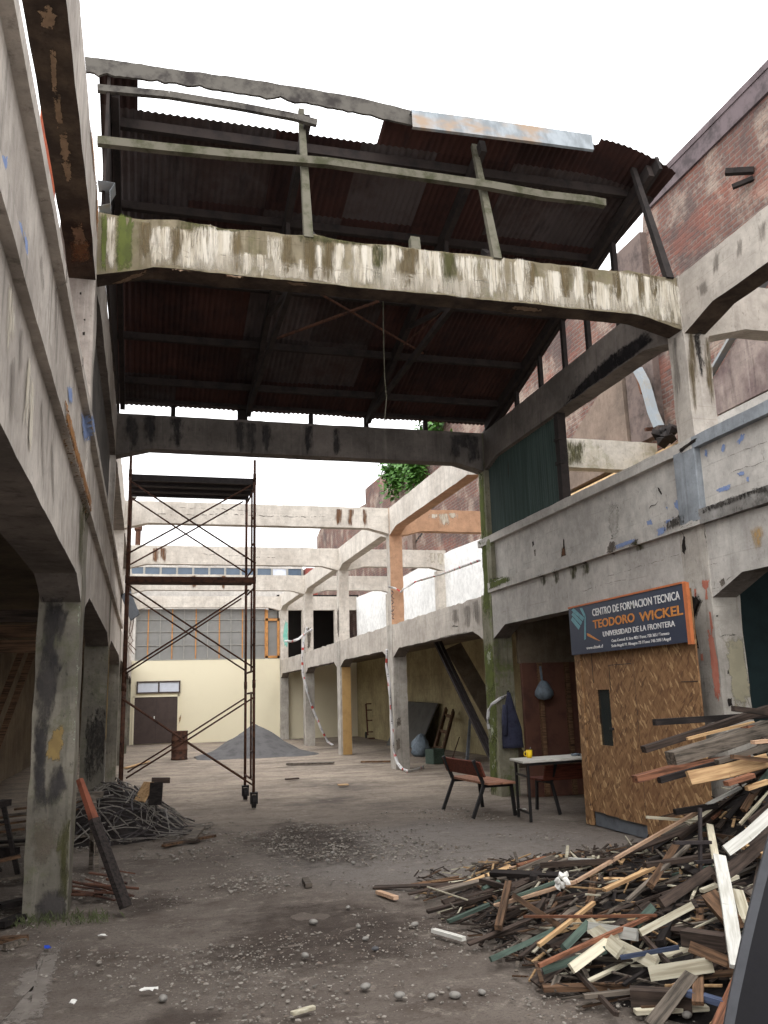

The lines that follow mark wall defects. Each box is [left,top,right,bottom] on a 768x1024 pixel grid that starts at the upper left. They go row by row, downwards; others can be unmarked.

corrosion [40,110,55,199]
leakage [106,217,116,266]
leakage [140,222,682,323]
leakage [674,330,713,407]
leakage [126,416,155,445]
leakage [170,417,182,447]
leakage [235,422,271,453]
corrosion [336,509,367,525]
peeling [646,488,686,554]
peeling [692,578,733,706]